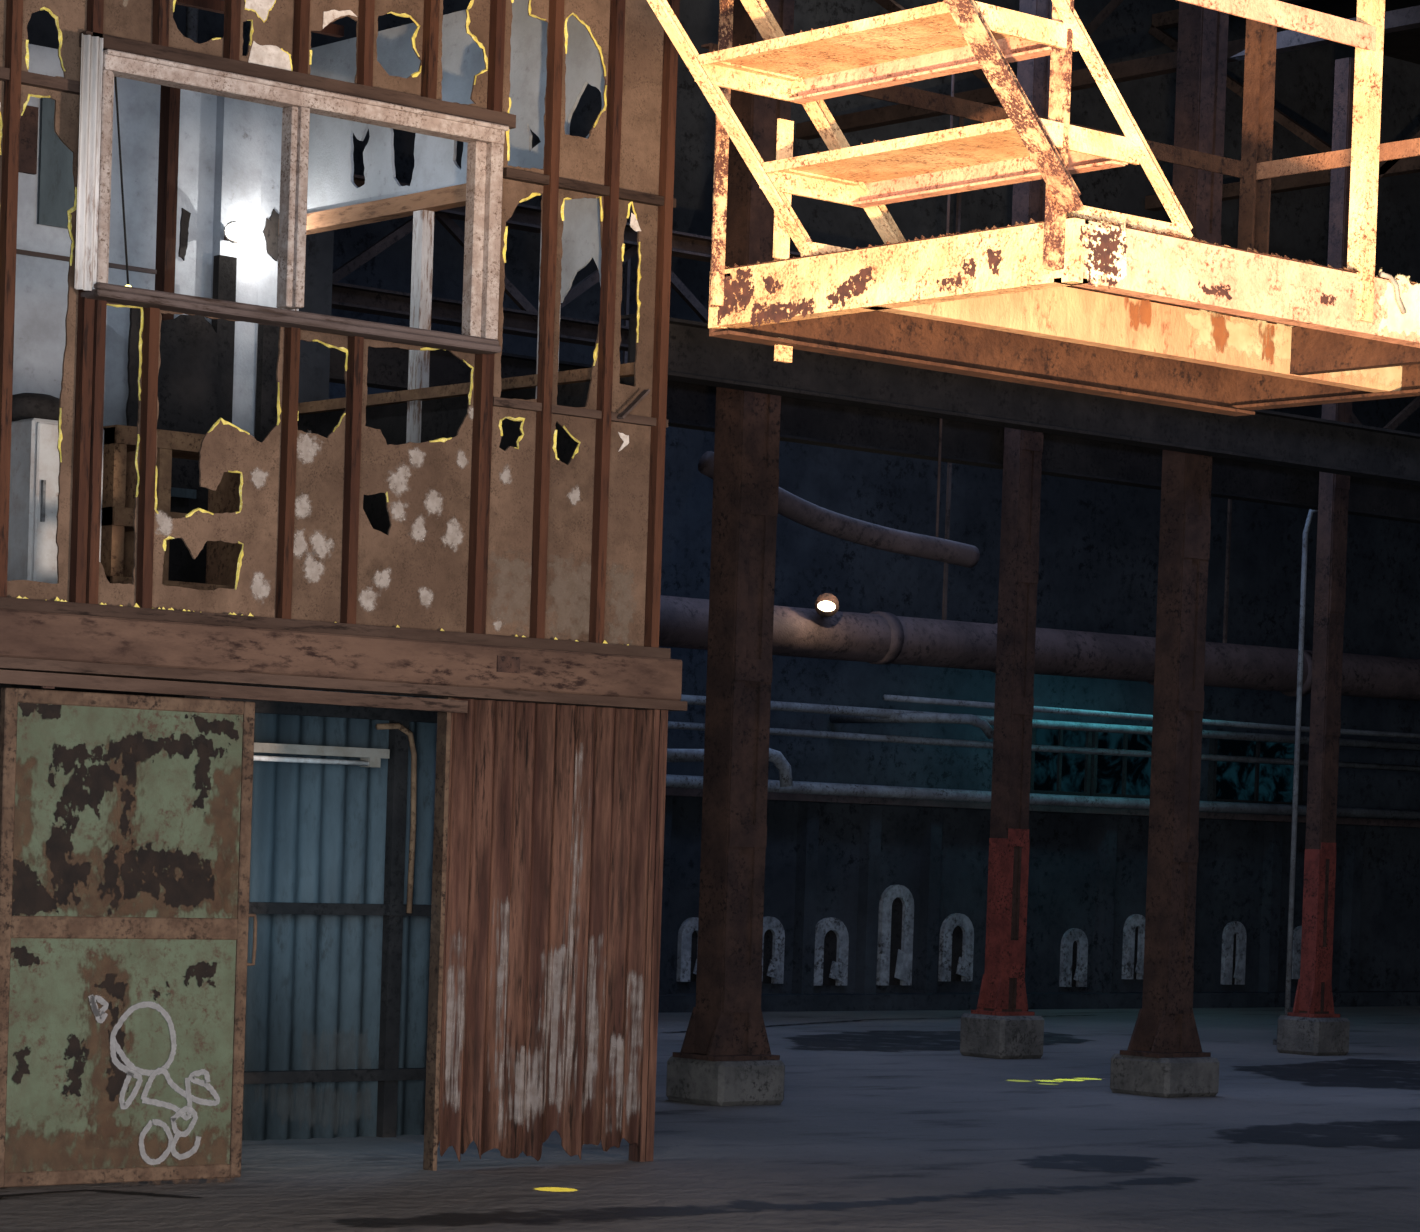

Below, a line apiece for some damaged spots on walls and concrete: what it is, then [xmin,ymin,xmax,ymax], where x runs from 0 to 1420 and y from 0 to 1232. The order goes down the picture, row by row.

corrosion [1125,297,1151,330]
corrosion [1212,314,1229,352]
corrosion [1259,324,1274,364]
peeling [18,703,62,720]
peeling [12,714,239,916]
peeling [11,946,40,966]
water stain [495,752,643,1138]
peeling [153,961,217,1001]
peeling [95,974,129,1101]
water stain [443,966,465,1109]
peeling [12,1047,31,1084]
peeling [62,1034,89,1099]